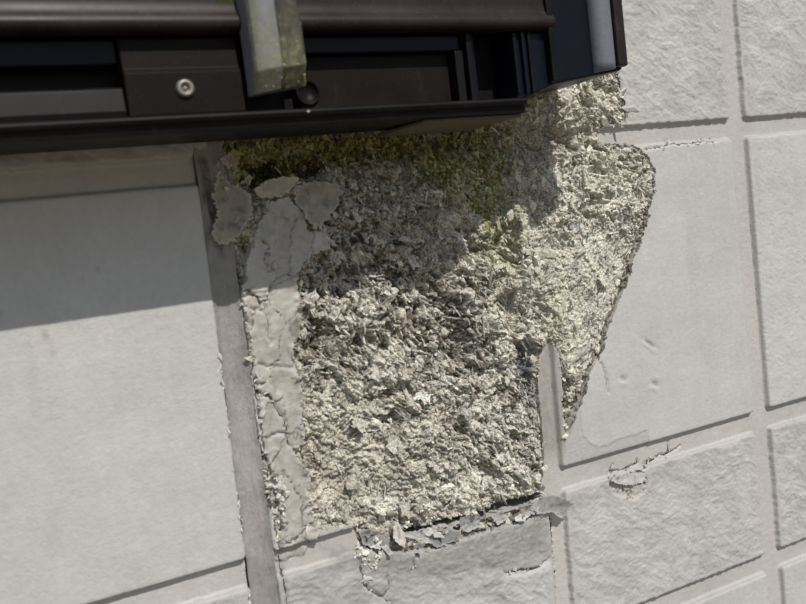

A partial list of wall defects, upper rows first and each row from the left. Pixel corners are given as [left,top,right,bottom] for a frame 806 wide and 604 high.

crack [645,138,714,150]
spalling [211,72,657,570]
crack [244,328,310,604]